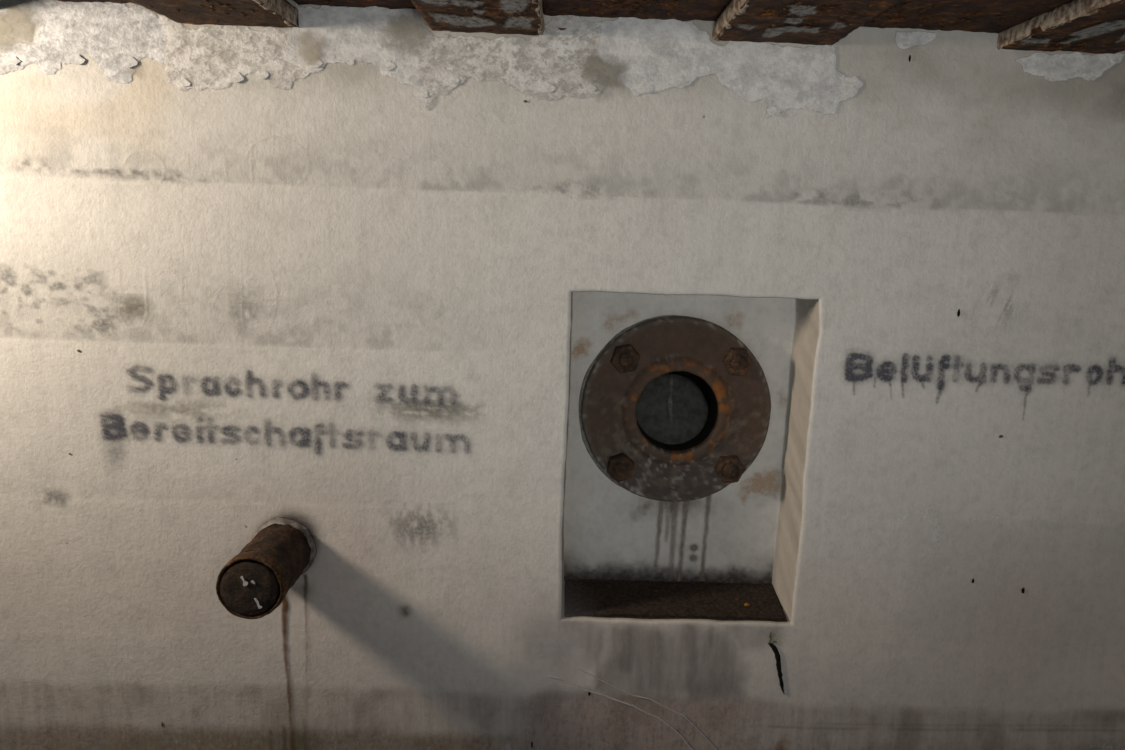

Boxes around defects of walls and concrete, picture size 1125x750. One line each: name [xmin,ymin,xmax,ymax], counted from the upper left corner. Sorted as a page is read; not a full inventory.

peeling [0,0,863,118]
peeling [1016,52,1125,82]
corrosion [282,598,291,722]
crack [768,632,784,693]